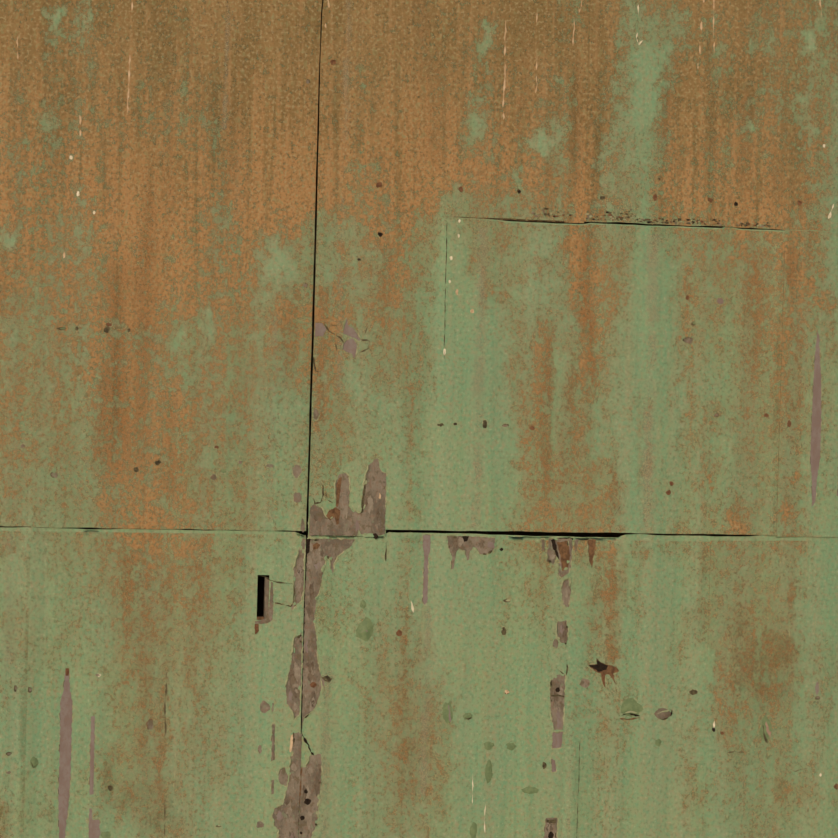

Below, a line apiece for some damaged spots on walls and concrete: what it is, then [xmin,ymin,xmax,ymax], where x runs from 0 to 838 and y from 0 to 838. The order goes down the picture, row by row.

corrosion [632,0,838,455]
corrosion [0,0,637,697]
peeling [809,331,823,507]
peeling [421,533,431,606]
peeling [446,534,497,570]
peeling [256,458,388,838]
peeling [552,620,570,649]
peeling [579,658,619,688]
peeling [57,668,74,838]
peeling [542,674,567,774]
peeling [542,817,559,838]